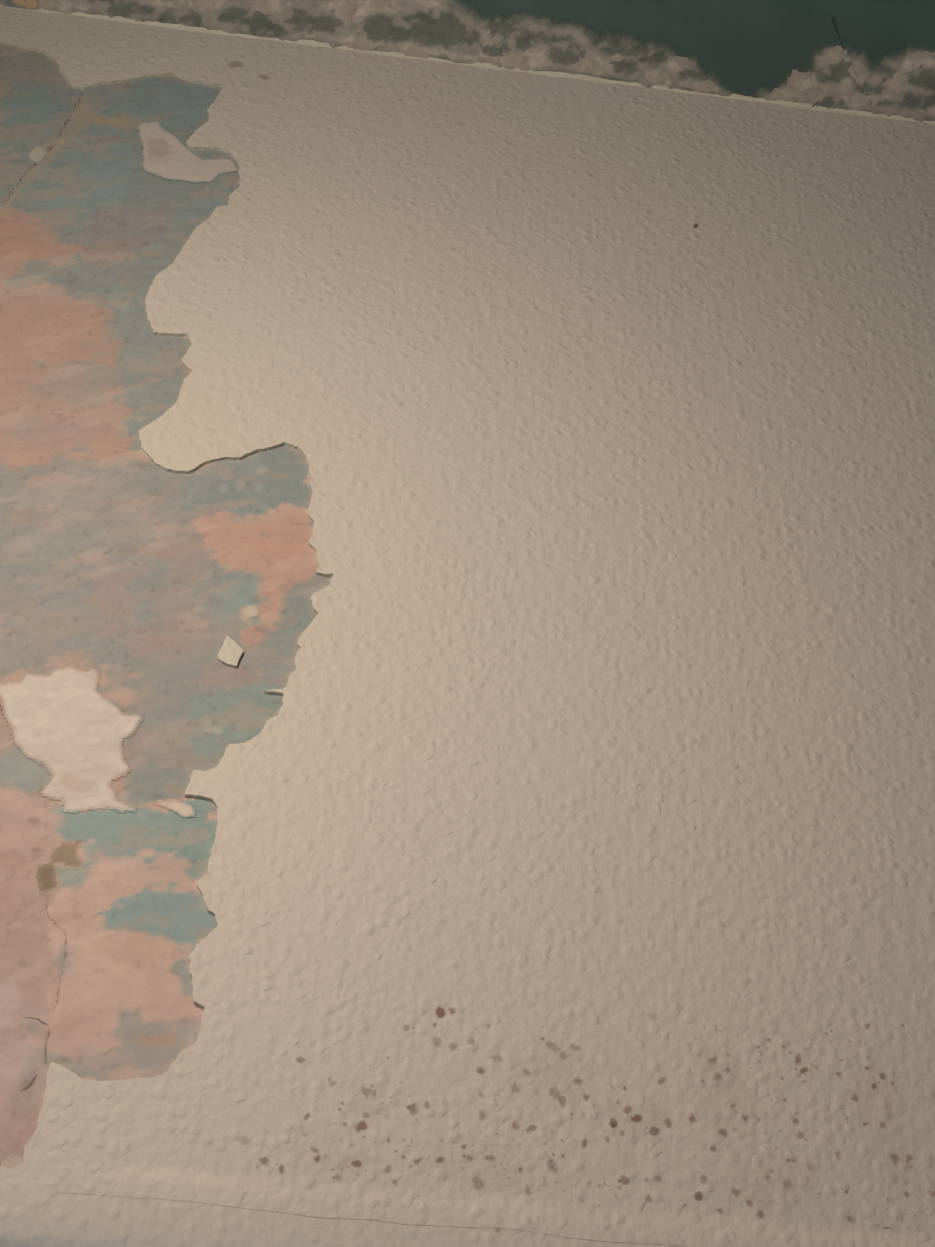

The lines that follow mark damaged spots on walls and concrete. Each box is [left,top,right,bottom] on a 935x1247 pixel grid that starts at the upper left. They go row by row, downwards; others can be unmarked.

peeling [0,44,332,1168]